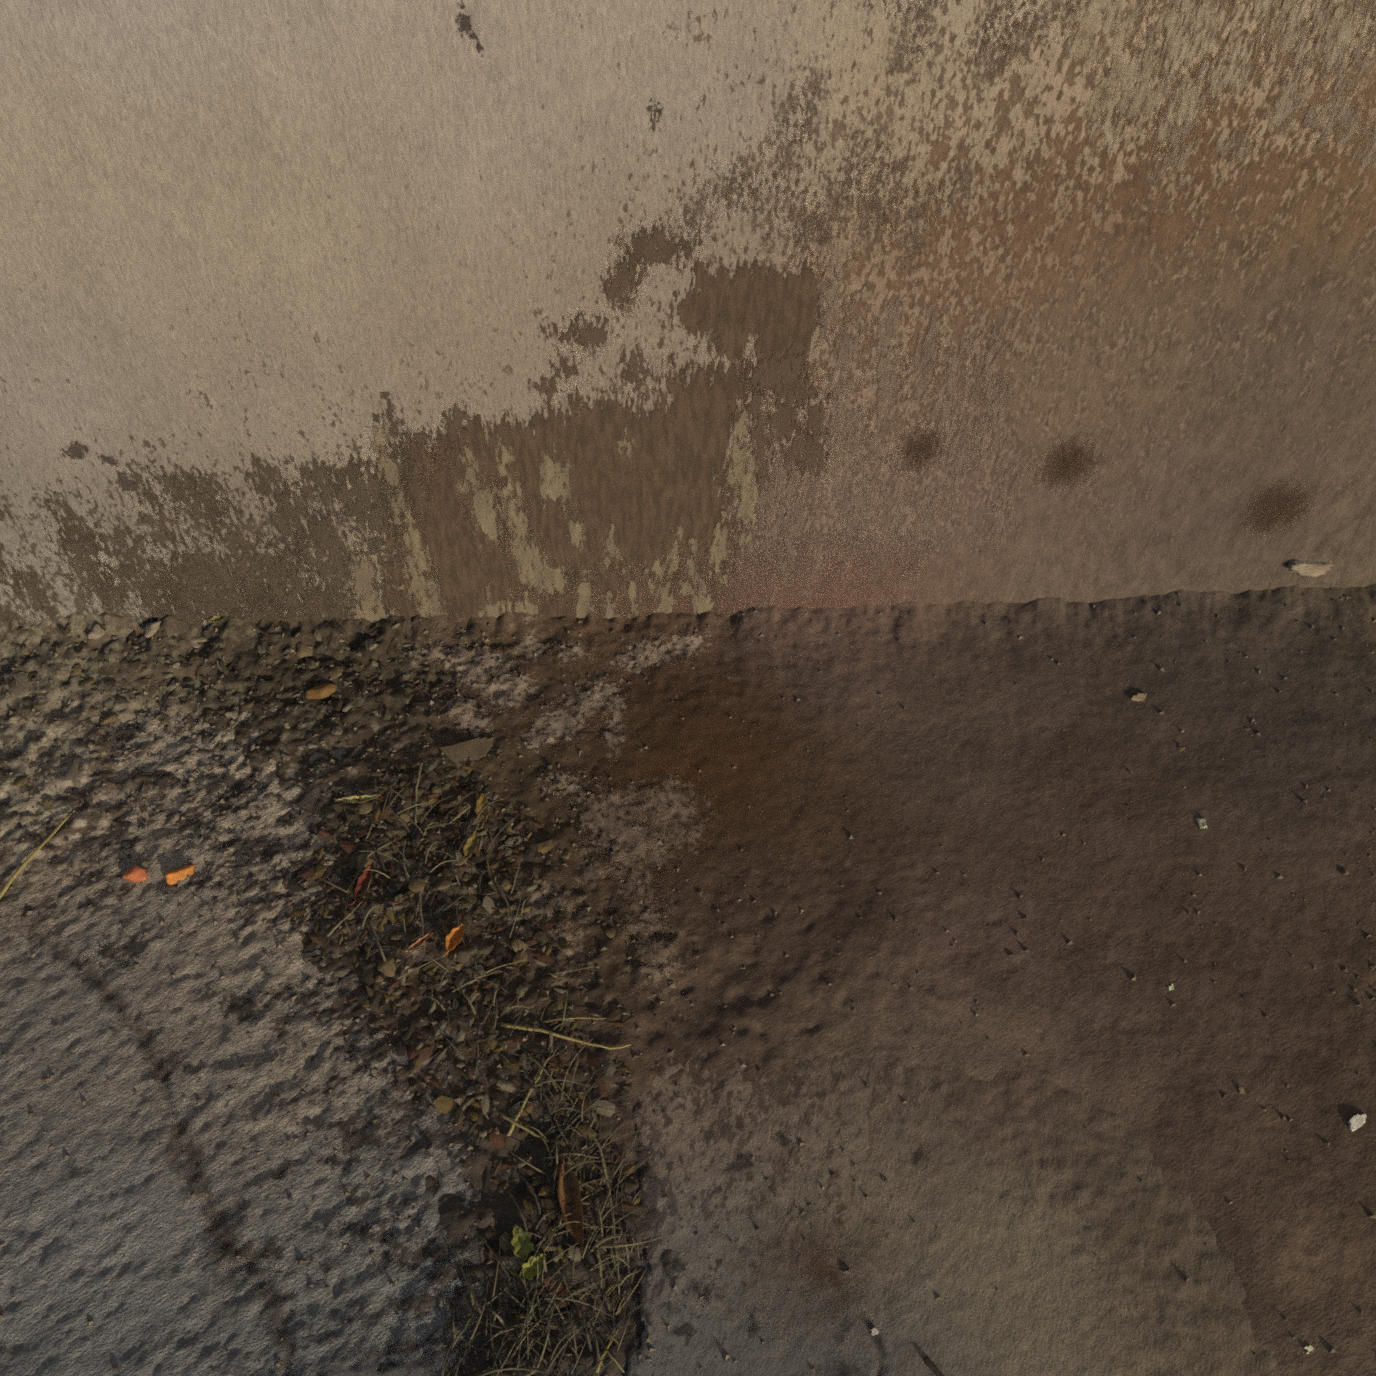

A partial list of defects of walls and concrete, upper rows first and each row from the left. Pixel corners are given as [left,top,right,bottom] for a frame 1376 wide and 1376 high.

leakage [370,215,831,761]